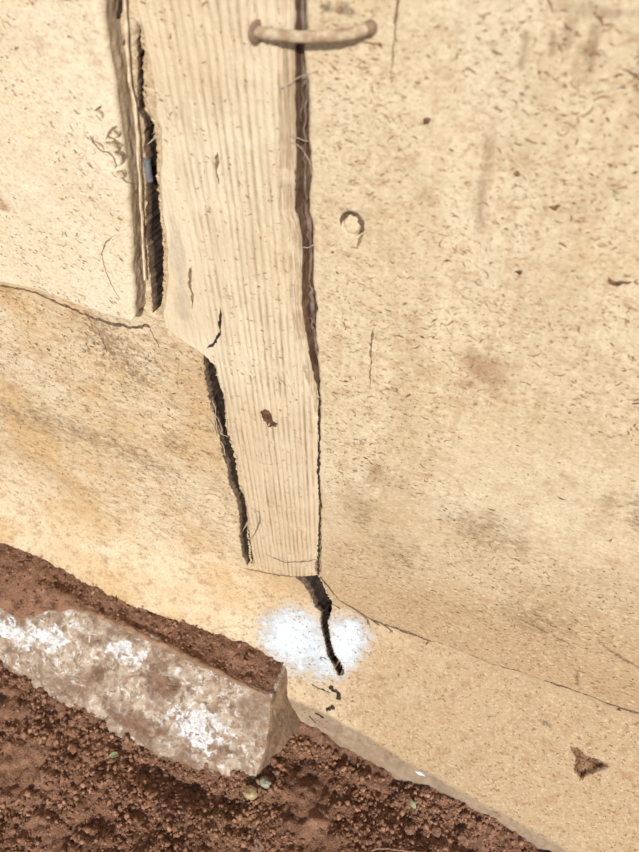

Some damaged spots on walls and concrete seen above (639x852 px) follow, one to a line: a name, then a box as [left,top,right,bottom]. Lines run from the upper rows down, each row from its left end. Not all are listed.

crack [202,0,639,723]